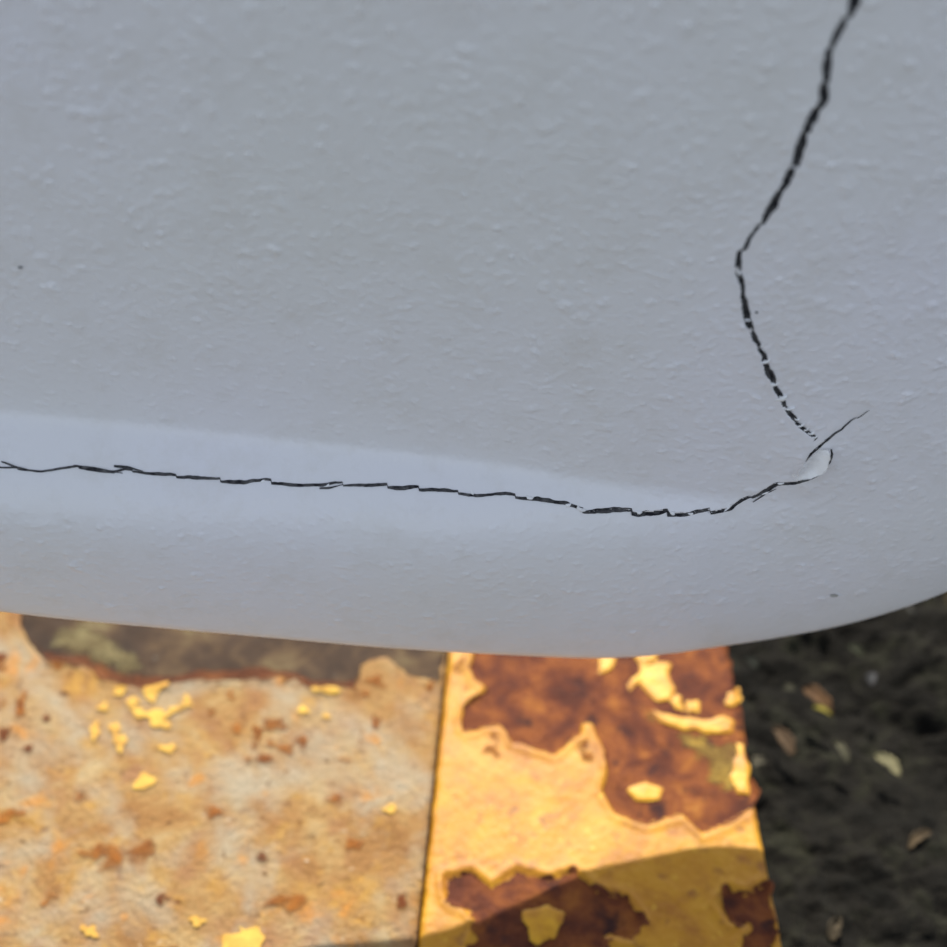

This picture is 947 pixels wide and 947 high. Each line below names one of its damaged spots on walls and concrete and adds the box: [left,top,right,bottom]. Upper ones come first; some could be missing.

crack [0,0,868,517]
corrosion [2,684,26,716]
corrosion [233,718,308,762]
corrosion [484,732,500,755]
corrosion [580,739,594,760]
peeling [461,646,760,832]
corrosion [0,809,25,823]
corrosion [79,840,155,867]
corrosion [265,894,307,910]
peeling [444,865,650,947]
peeling [721,879,779,947]